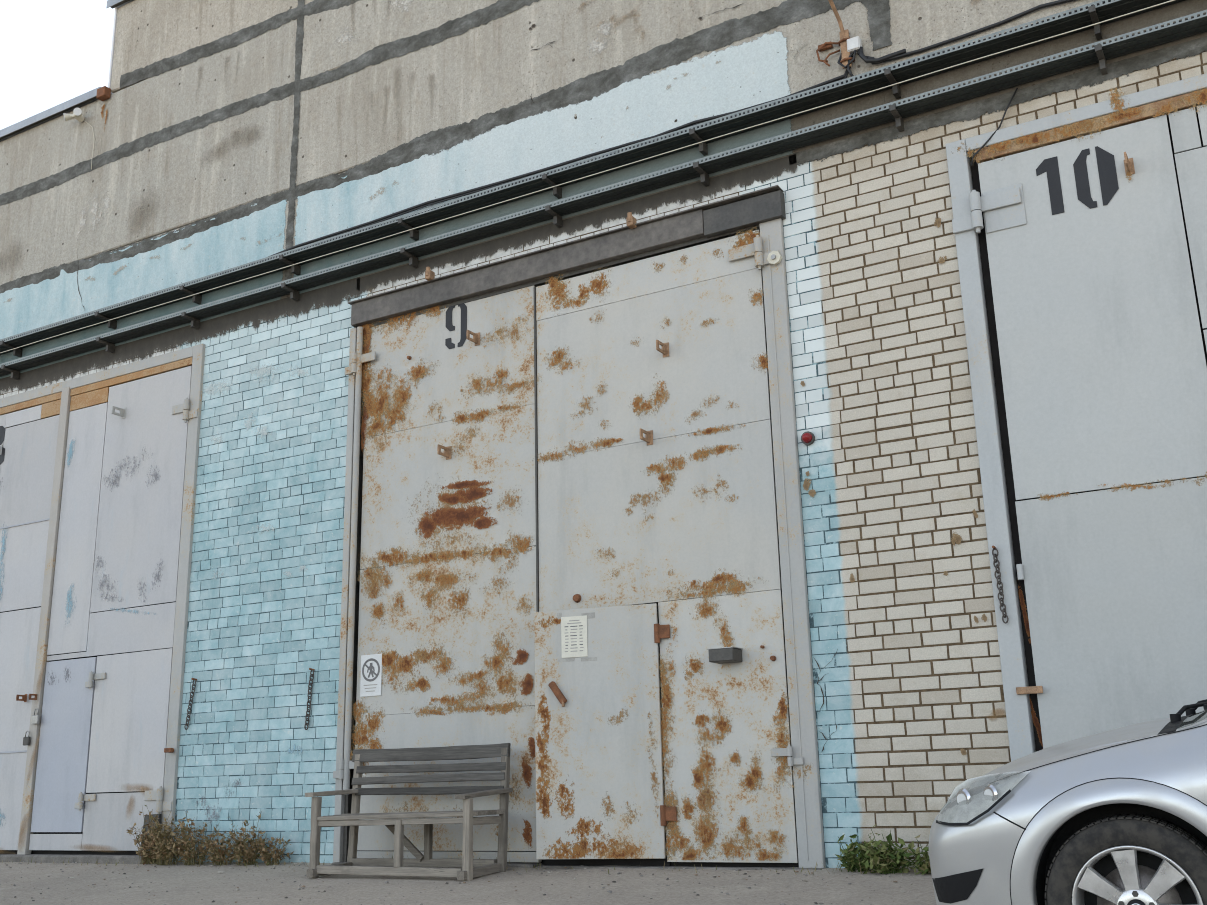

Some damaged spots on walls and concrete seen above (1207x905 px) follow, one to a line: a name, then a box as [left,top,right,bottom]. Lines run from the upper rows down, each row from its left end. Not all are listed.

rust [957,88,1207,164]
rust [545,268,610,321]
rust [360,305,446,459]
rust [427,368,538,453]
rust [544,347,582,375]
rust [537,382,623,462]
rust [632,373,670,415]
rust [625,396,745,521]
rust [358,480,532,621]
rust [350,700,385,774]
rust [379,632,642,859]
rust [648,568,811,861]